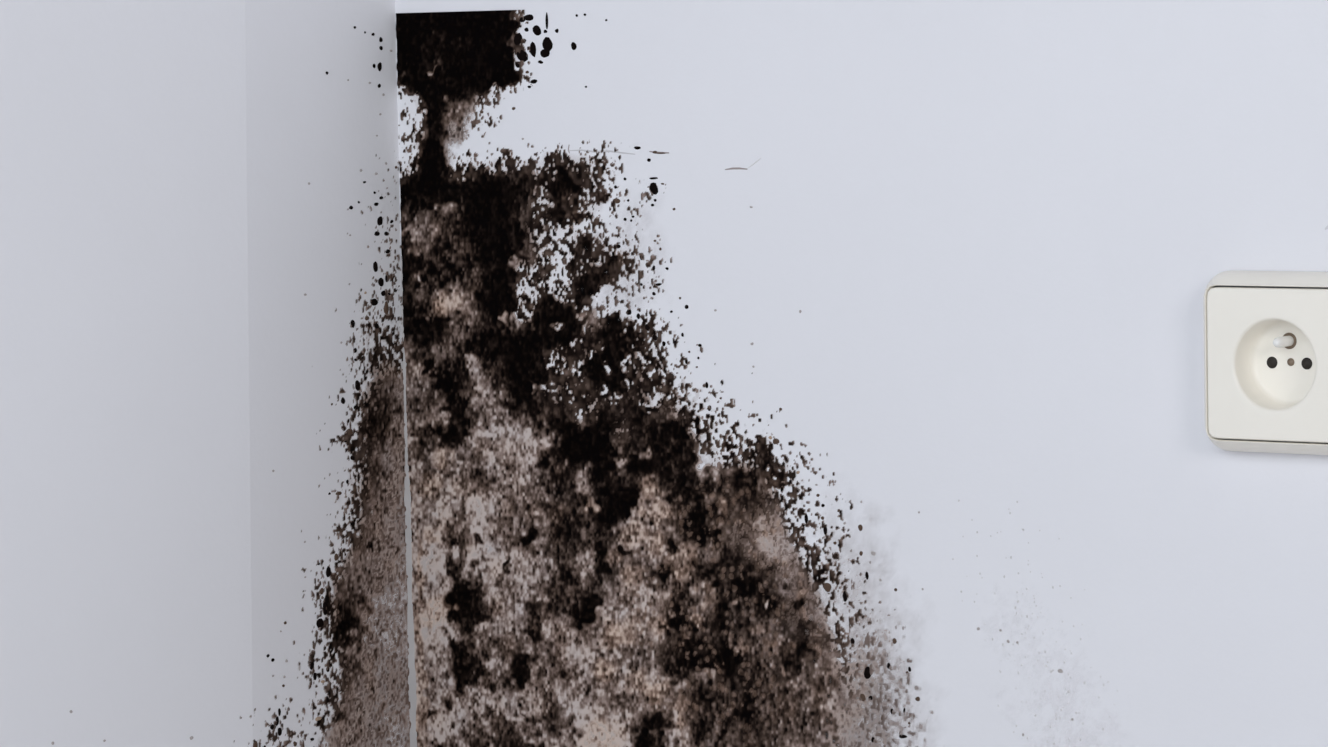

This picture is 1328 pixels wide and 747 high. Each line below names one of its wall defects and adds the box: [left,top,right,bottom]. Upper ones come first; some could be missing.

damp [240,10,933,747]